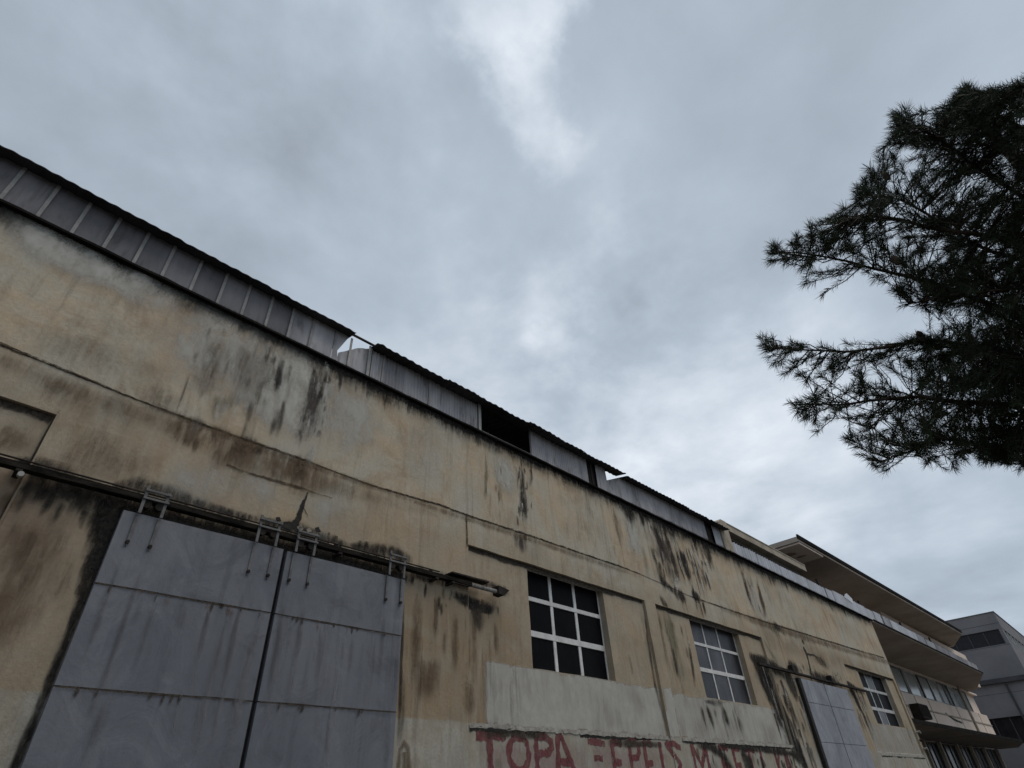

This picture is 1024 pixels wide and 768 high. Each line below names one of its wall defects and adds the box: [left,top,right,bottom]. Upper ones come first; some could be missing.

damp [0,205,892,768]